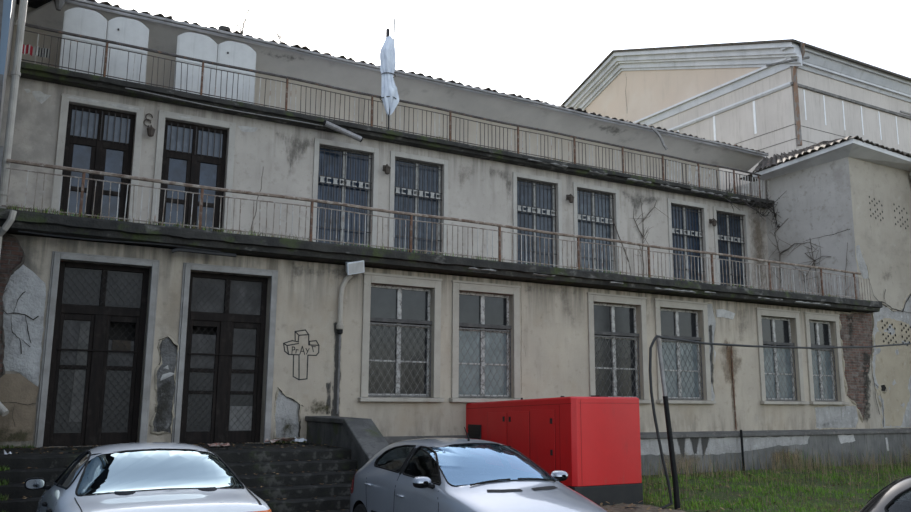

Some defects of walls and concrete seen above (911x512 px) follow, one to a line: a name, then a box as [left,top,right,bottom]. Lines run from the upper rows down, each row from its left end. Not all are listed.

flaking render [149,336,179,436]
flaking render [273,387,302,439]
flaking render [640,288,911,455]